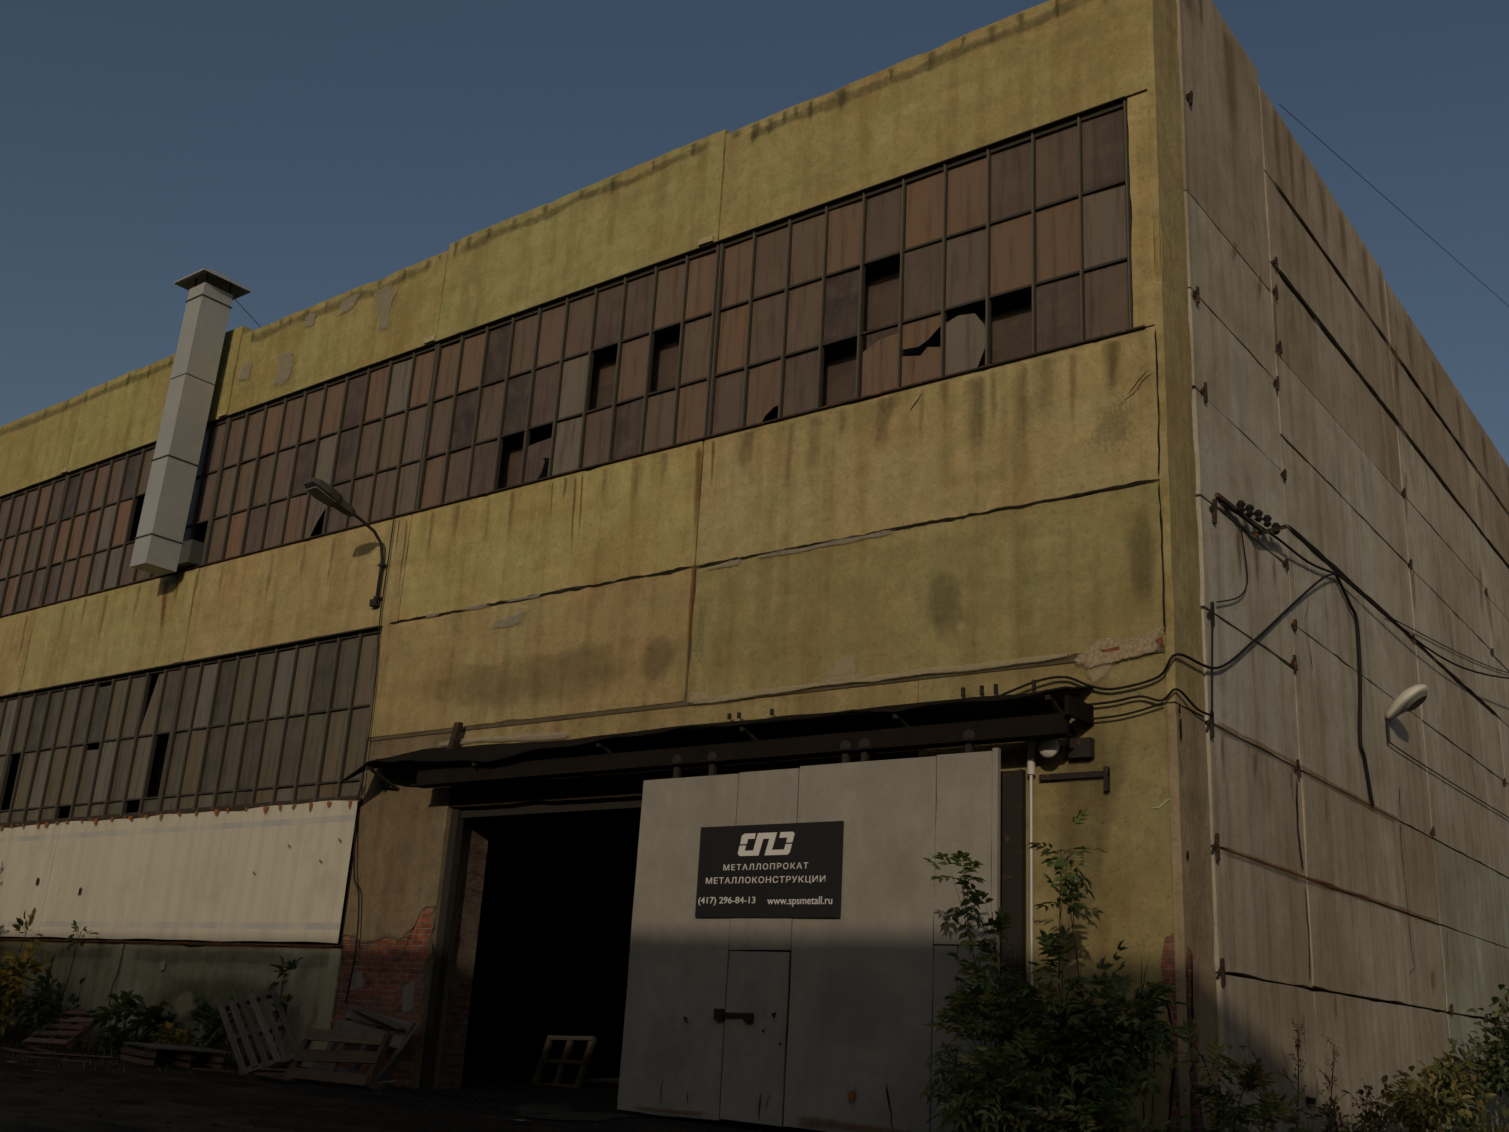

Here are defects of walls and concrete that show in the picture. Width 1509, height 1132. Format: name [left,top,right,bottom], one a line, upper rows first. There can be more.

spalling [689,626,1164,703]